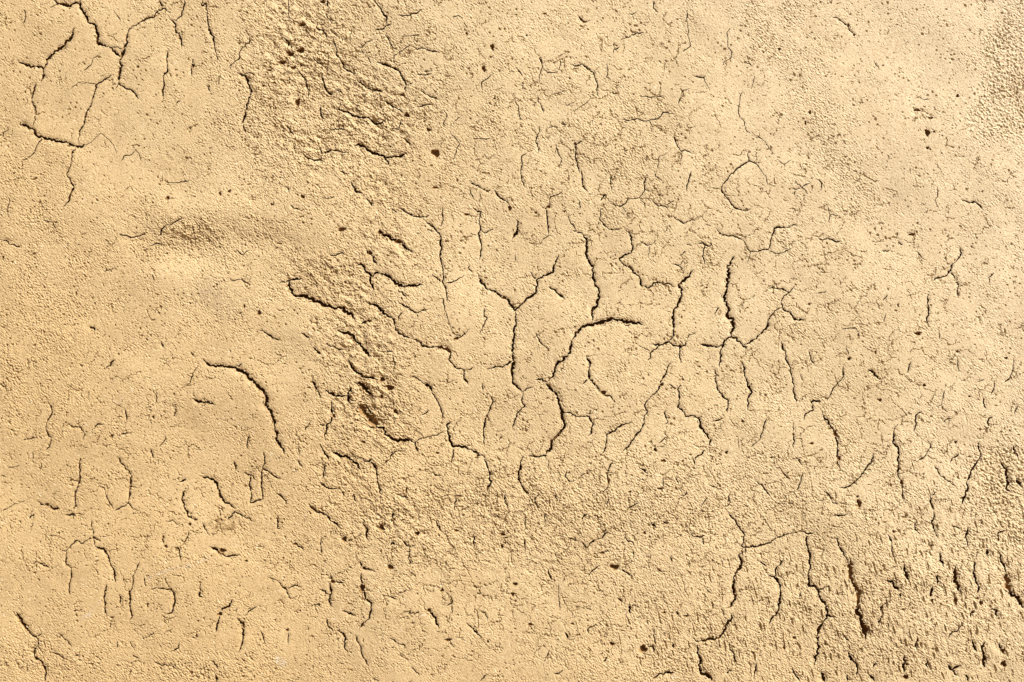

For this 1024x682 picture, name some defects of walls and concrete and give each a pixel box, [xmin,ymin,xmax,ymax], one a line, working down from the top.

crack [2,0,256,230]
crack [154,0,911,682]
crack [882,241,921,258]
crack [925,245,963,339]
crack [934,186,984,211]
crack [1,403,290,682]
crack [891,358,1024,681]